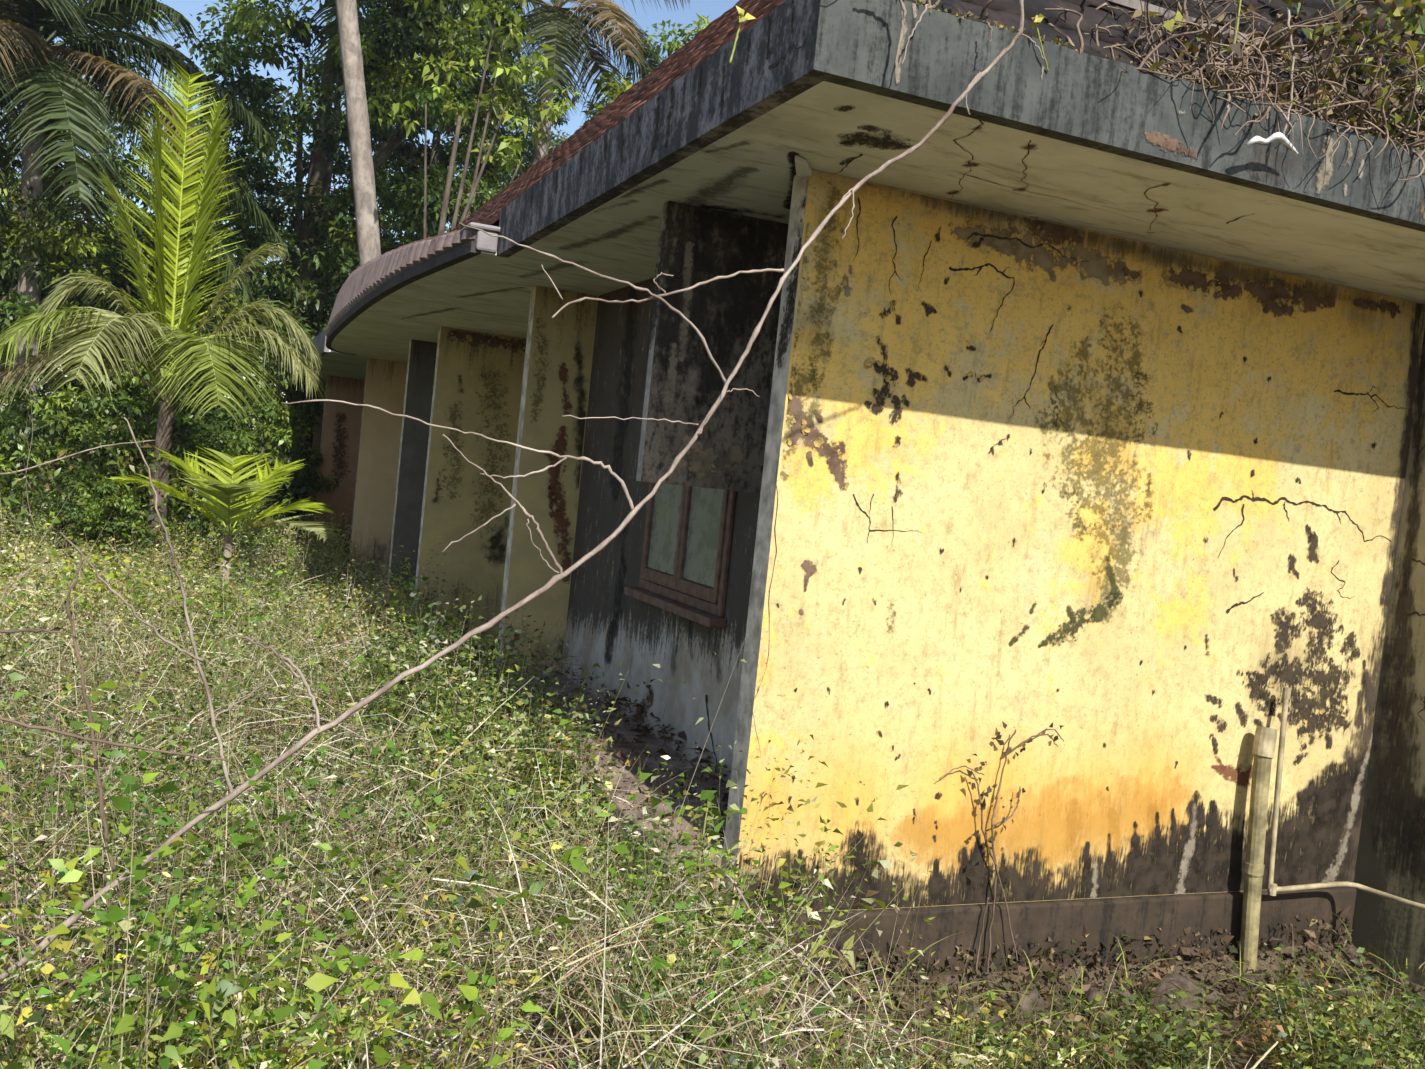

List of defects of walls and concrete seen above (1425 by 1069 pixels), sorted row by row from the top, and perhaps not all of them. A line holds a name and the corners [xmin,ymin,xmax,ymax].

crack [835,154,1015,332]
corrosion [545,362,573,582]
leakage [415,152,808,503]
flaking render [787,393,849,490]
peeling [879,300,901,325]
peeling [864,336,928,448]
crack [989,324,1054,453]
leakage [1038,556,1124,648]
crack [1226,592,1264,614]
leakage [1205,303,1425,896]
crack [1213,491,1425,599]
leakage [734,790,1249,915]